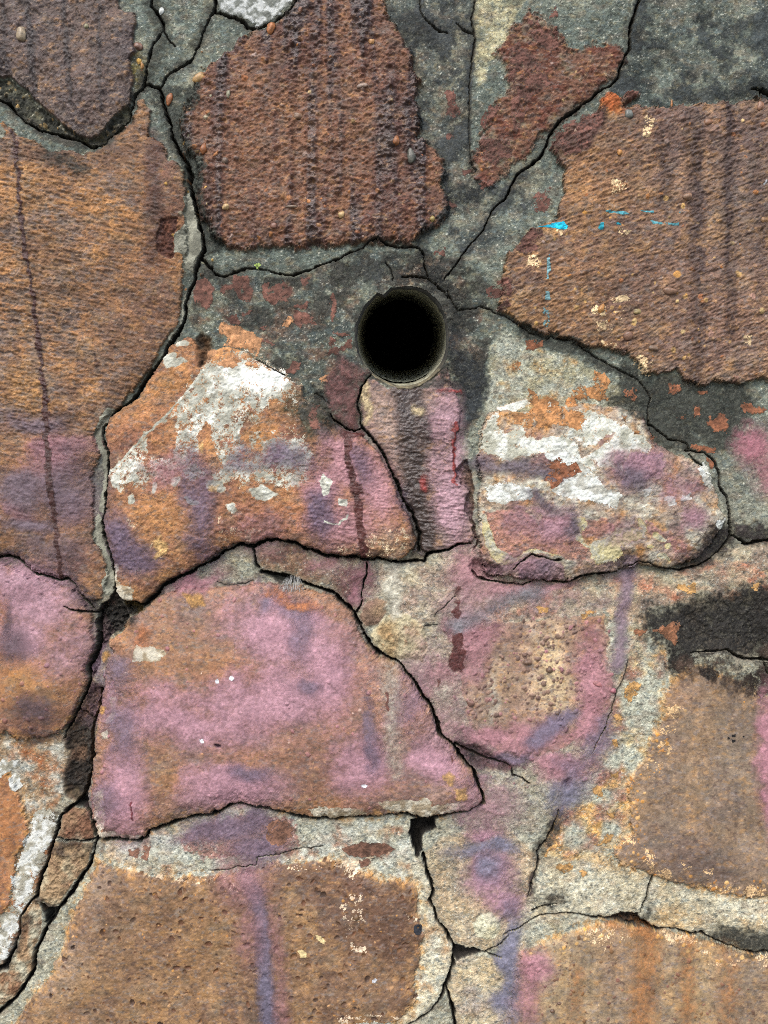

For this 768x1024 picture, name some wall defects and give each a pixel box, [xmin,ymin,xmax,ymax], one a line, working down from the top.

crack [0,0,768,601]
crack [0,375,530,1024]
crack [592,663,628,753]
crack [690,648,768,674]
crack [481,810,768,958]